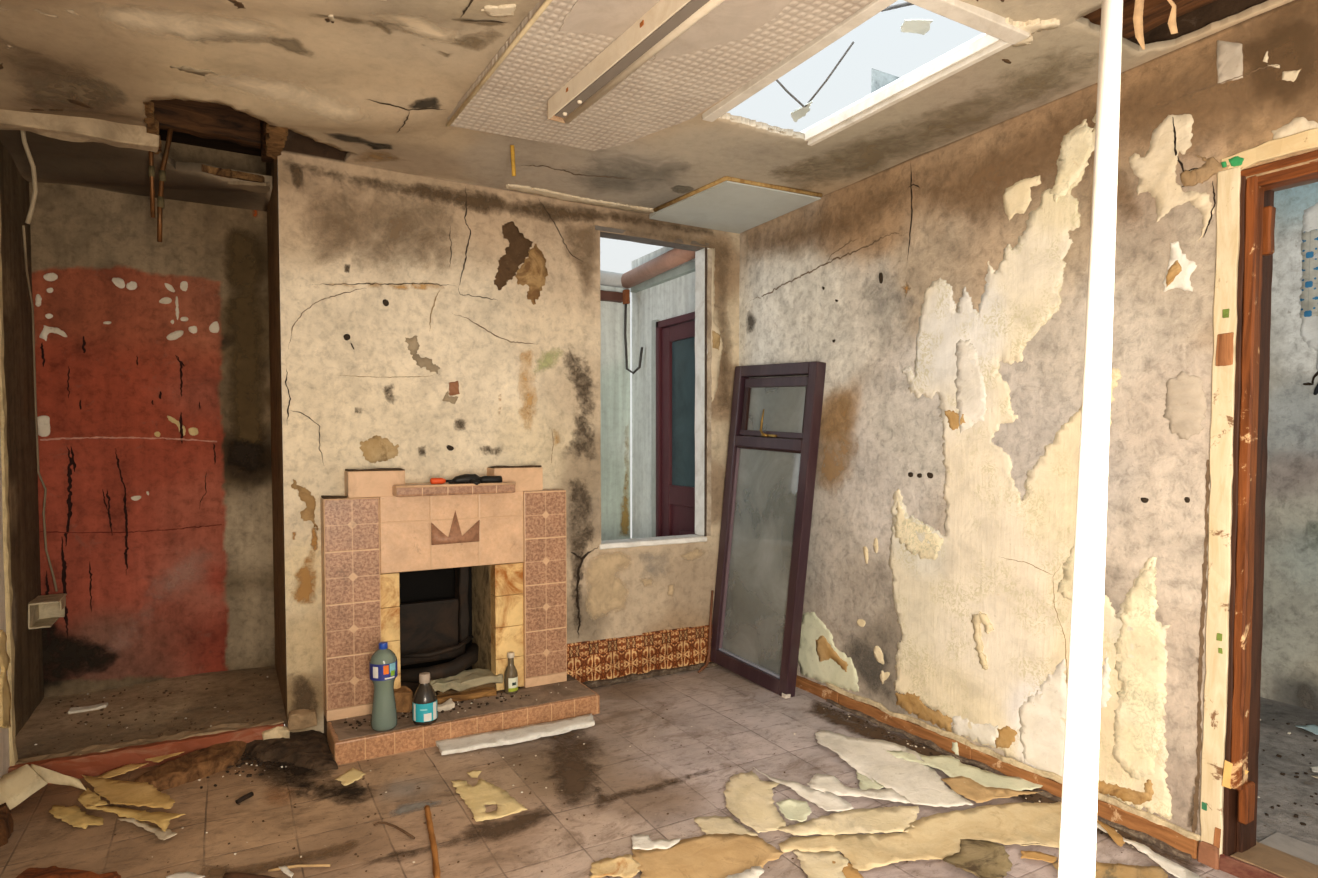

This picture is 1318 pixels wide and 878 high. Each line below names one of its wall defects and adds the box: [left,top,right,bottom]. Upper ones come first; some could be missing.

crack [285,187,533,464]
water stain [317,178,656,283]
spalling [494,221,548,305]
water stain [699,229,728,406]
peeling [1162,241,1197,292]
crack [40,435,217,443]
water stain [569,354,594,457]
crack [39,473,222,533]
spalling [291,479,319,531]
water stain [571,482,592,625]
peeling [874,646,1068,777]
peeling [1098,779,1154,805]